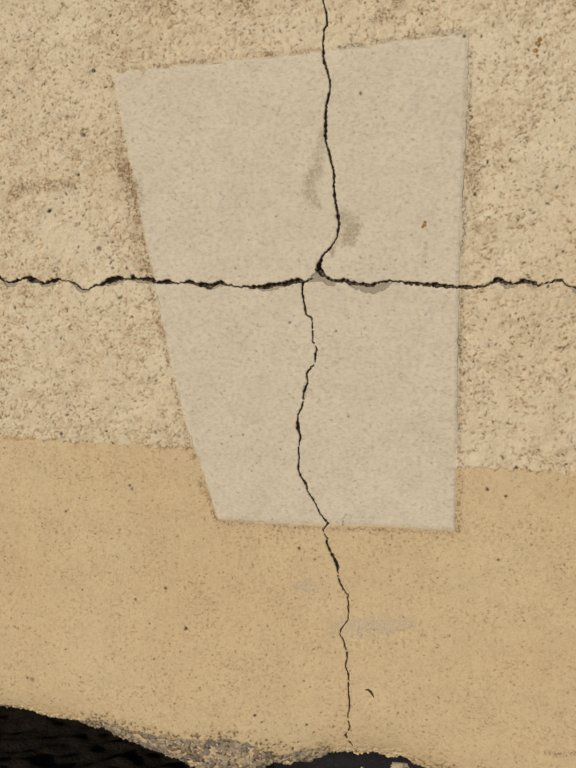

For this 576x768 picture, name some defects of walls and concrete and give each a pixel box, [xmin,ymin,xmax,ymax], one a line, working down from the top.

crack [0,0,576,362]
crack [296,367,350,713]
spalling [0,705,332,768]
spalling [390,760,419,768]